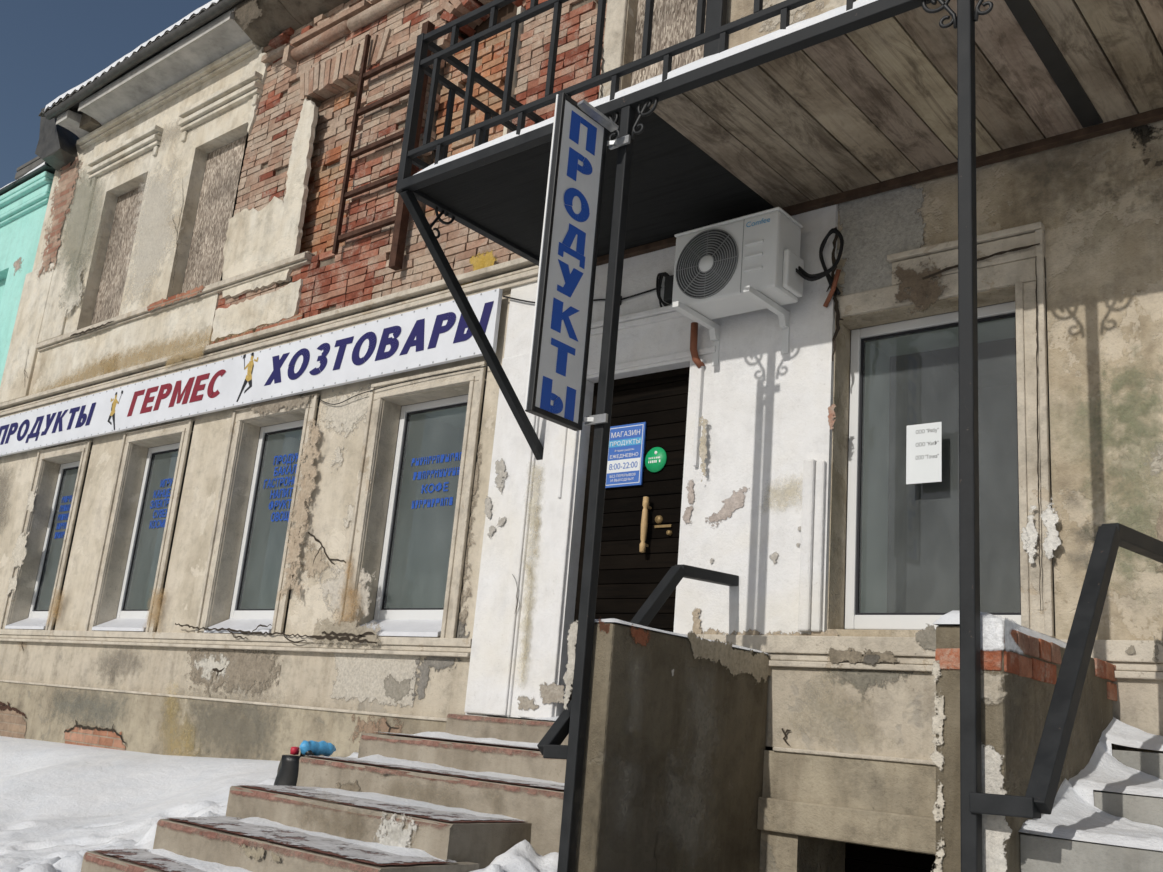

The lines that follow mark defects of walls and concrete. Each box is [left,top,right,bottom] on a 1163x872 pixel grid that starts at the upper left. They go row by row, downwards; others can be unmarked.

flaking render [230,0,262,32]
flaking render [210,311,303,345]
peeling [706,487,750,527]
crack [308,532,346,565]
flaking render [185,648,283,699]
flaking render [688,608,898,684]
flaking render [980,628,1063,704]
flaking render [0,709,26,739]
flaking render [64,726,125,750]
flaking render [915,624,960,872]
flaking render [981,744,1007,795]
flaking render [982,814,1012,872]